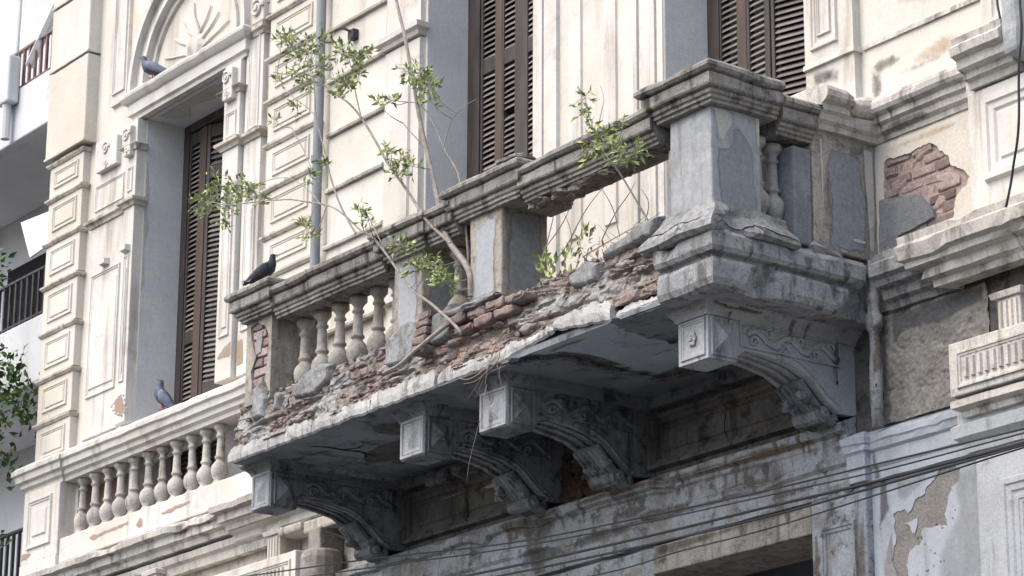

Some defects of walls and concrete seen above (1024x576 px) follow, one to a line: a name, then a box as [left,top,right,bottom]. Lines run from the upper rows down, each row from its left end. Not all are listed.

spalling [528,155,656,214]
crack [649,216,799,242]
spalling [879,143,970,252]
spalling [217,242,703,446]
spalling [559,453,604,504]
peeling [885,466,960,576]